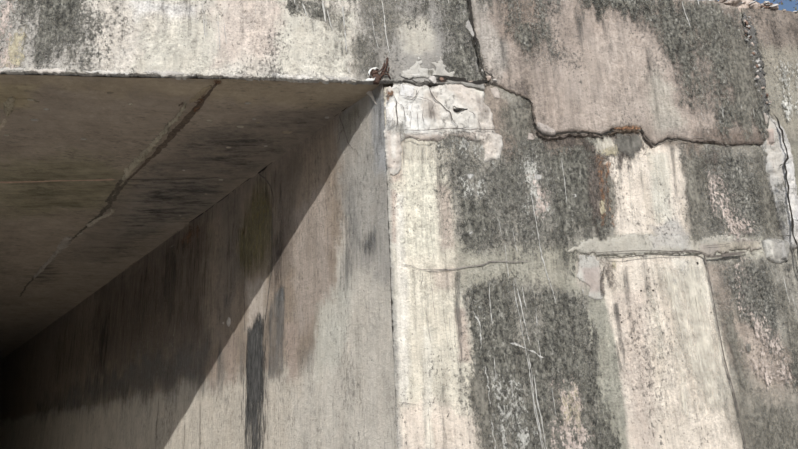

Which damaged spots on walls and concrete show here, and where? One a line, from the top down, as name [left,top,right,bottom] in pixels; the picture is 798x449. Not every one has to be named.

spalling [0,67,67,75]
spalling [145,70,196,78]
flaking render [268,57,503,176]
crack [394,0,500,141]
crack [520,95,755,148]
leakage [575,0,780,242]
crack [772,112,798,272]
leakage [425,80,642,449]
leakage [241,288,284,449]